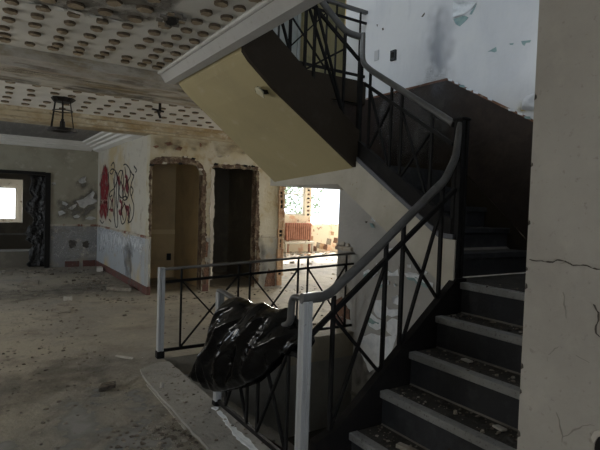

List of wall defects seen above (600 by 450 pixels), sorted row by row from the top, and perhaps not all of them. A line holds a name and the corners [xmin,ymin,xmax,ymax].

peeling [453,1,477,26]
peeling [58,177,98,220]
flaking render [148,142,285,291]
peeling [380,262,433,288]
crack [529,257,600,270]
peeling [360,295,398,372]
crack [592,304,600,337]